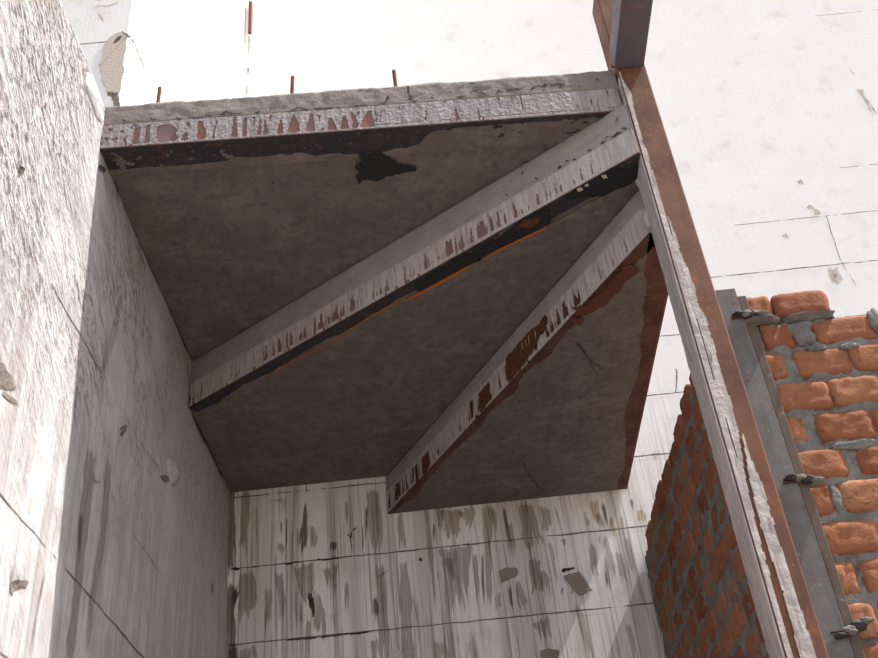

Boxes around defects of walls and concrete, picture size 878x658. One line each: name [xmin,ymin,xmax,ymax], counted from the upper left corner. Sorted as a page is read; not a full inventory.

spalling [99,32,127,106]
spalling [355,151,417,184]
spalling [414,209,551,292]
spalling [505,315,548,382]
spalling [469,383,492,419]
spalling [412,451,430,483]